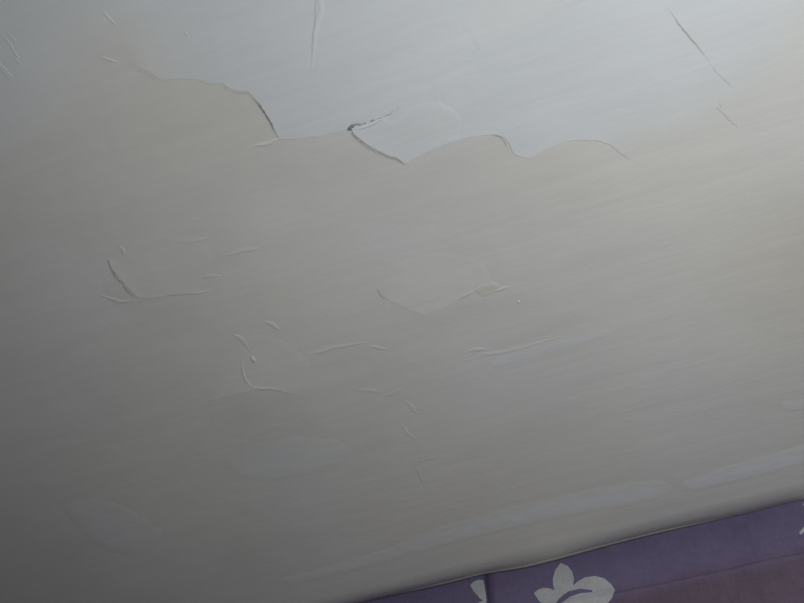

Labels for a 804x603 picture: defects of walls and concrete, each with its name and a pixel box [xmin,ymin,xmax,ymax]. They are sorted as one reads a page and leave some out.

peeling [0,0,804,228]